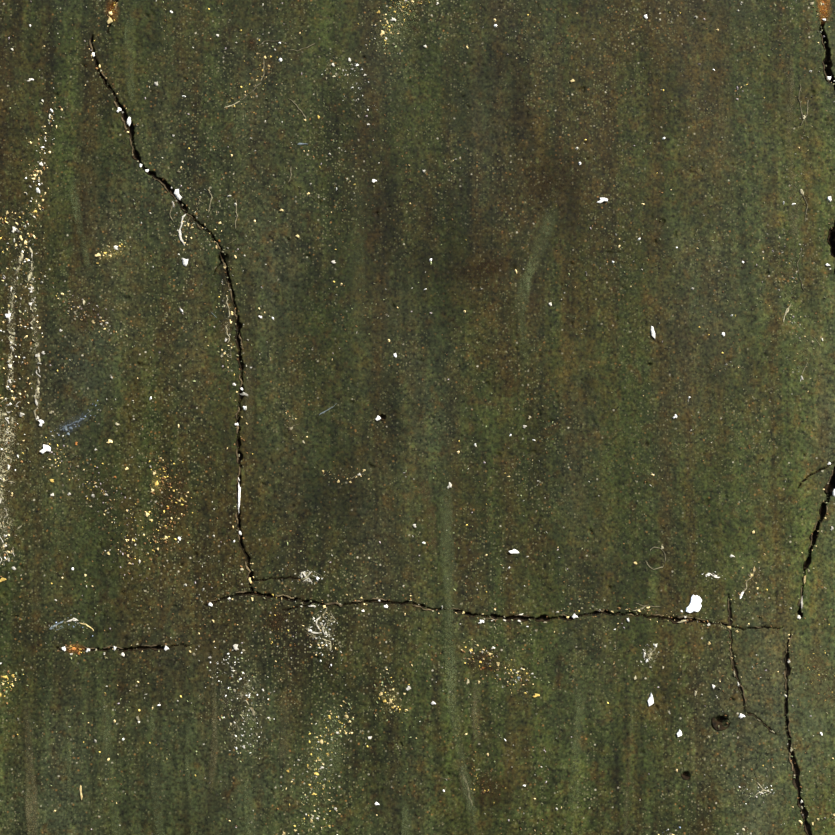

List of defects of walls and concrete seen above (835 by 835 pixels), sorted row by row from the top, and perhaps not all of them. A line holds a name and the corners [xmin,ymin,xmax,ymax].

crack [107,0,118,32]
crack [818,0,835,90]
crack [826,221,835,270]
crack [87,36,783,736]
crack [797,462,835,620]
crack [57,640,191,657]
crack [777,631,814,835]